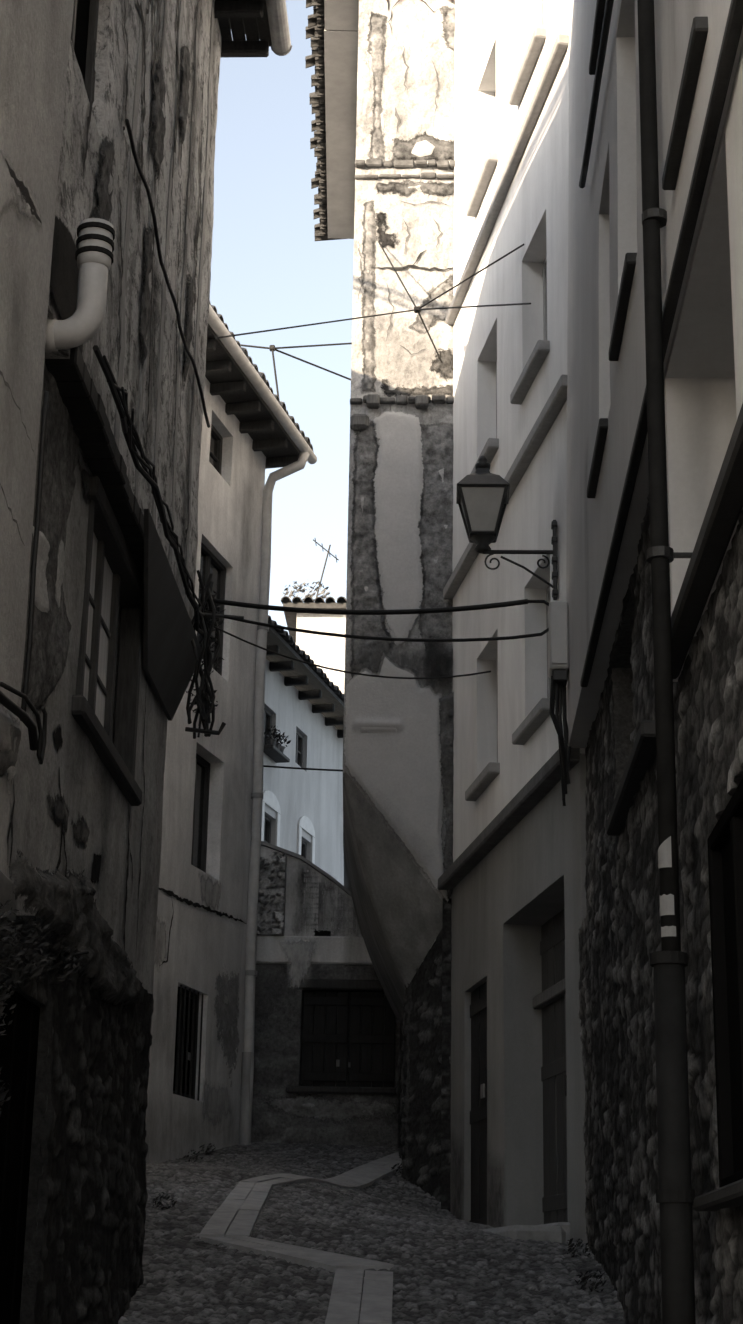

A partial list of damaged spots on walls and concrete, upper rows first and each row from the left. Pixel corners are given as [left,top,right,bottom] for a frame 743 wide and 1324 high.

crack [5,158,42,224]
damp [187,0,202,192]
spalling [367,12,454,162]
crack [386,0,443,132]
spalling [440,0,455,51]
spalling [361,180,454,397]
flaking render [349,421,396,679]
flaking render [418,423,454,870]